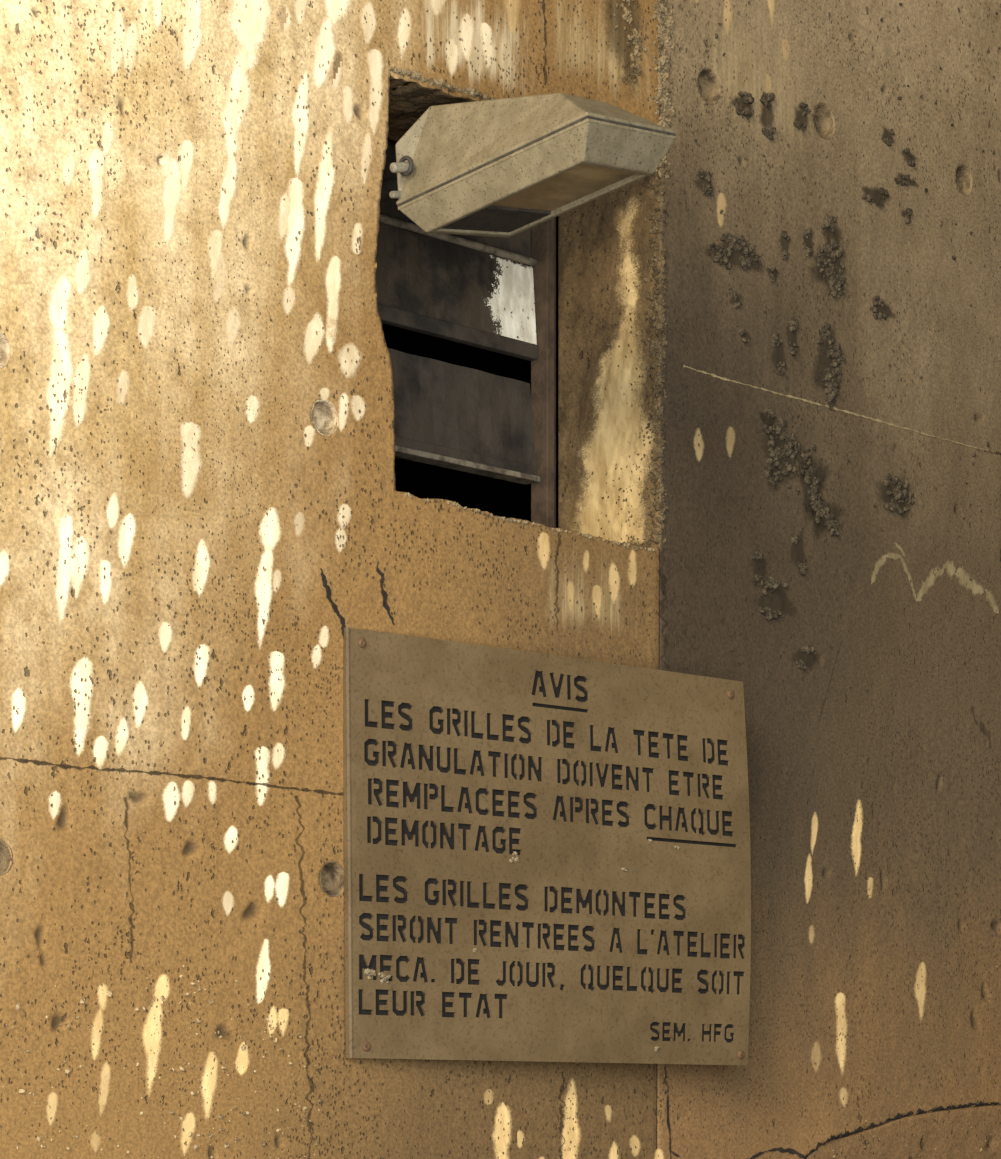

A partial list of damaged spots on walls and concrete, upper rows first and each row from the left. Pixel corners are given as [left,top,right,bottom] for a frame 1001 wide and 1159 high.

spalling [707,215,847,299]
damp [572,200,656,599]
spalling [761,408,841,575]
crack [320,568,345,639]
crack [376,564,394,625]
damp [538,533,549,568]
spalling [751,549,794,621]
crack [666,1096,680,1159]
crack [749,1101,1001,1159]